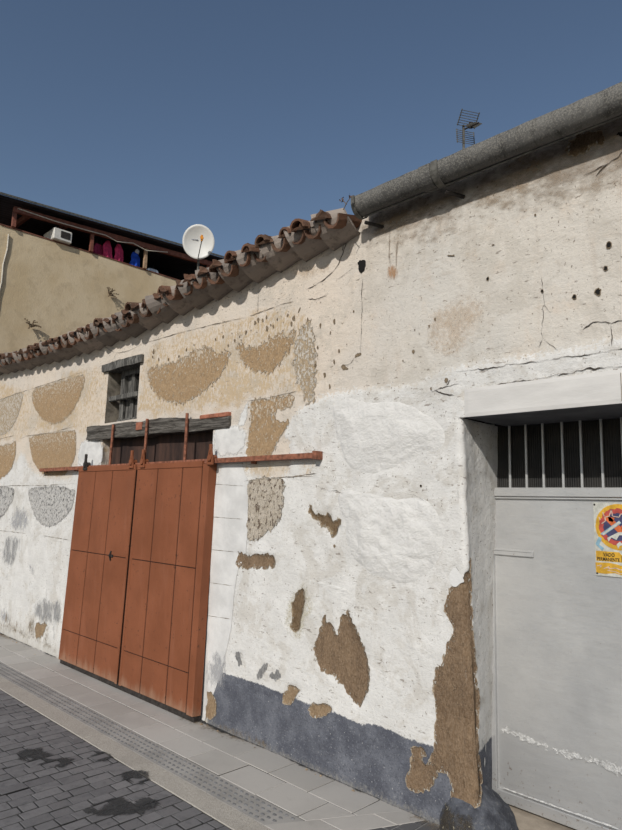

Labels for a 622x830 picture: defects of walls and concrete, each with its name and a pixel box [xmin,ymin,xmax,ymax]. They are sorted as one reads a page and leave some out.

crack [432,278,622,395]
flaking render [246,475,286,541]
flaking render [308,505,341,548]
flaking render [236,552,275,570]
flaking render [290,588,305,632]
flaking render [311,610,370,707]
flaking render [405,558,486,830]
water stain [121,770,150,784]
peeling [500,725,622,777]
water stain [82,797,159,817]